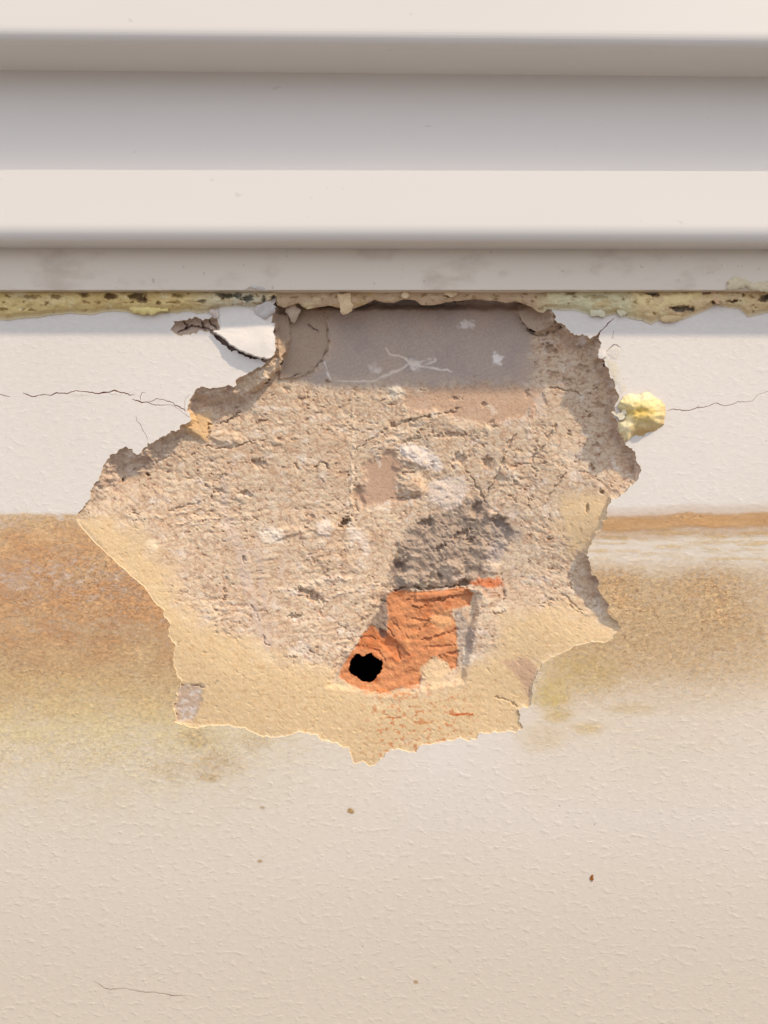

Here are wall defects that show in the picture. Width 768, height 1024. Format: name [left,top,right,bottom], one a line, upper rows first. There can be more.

crack [0,390,189,439]
crack [667,391,767,411]
water stain [0,513,248,764]
spalling [76,299,641,766]
water stain [539,512,768,718]